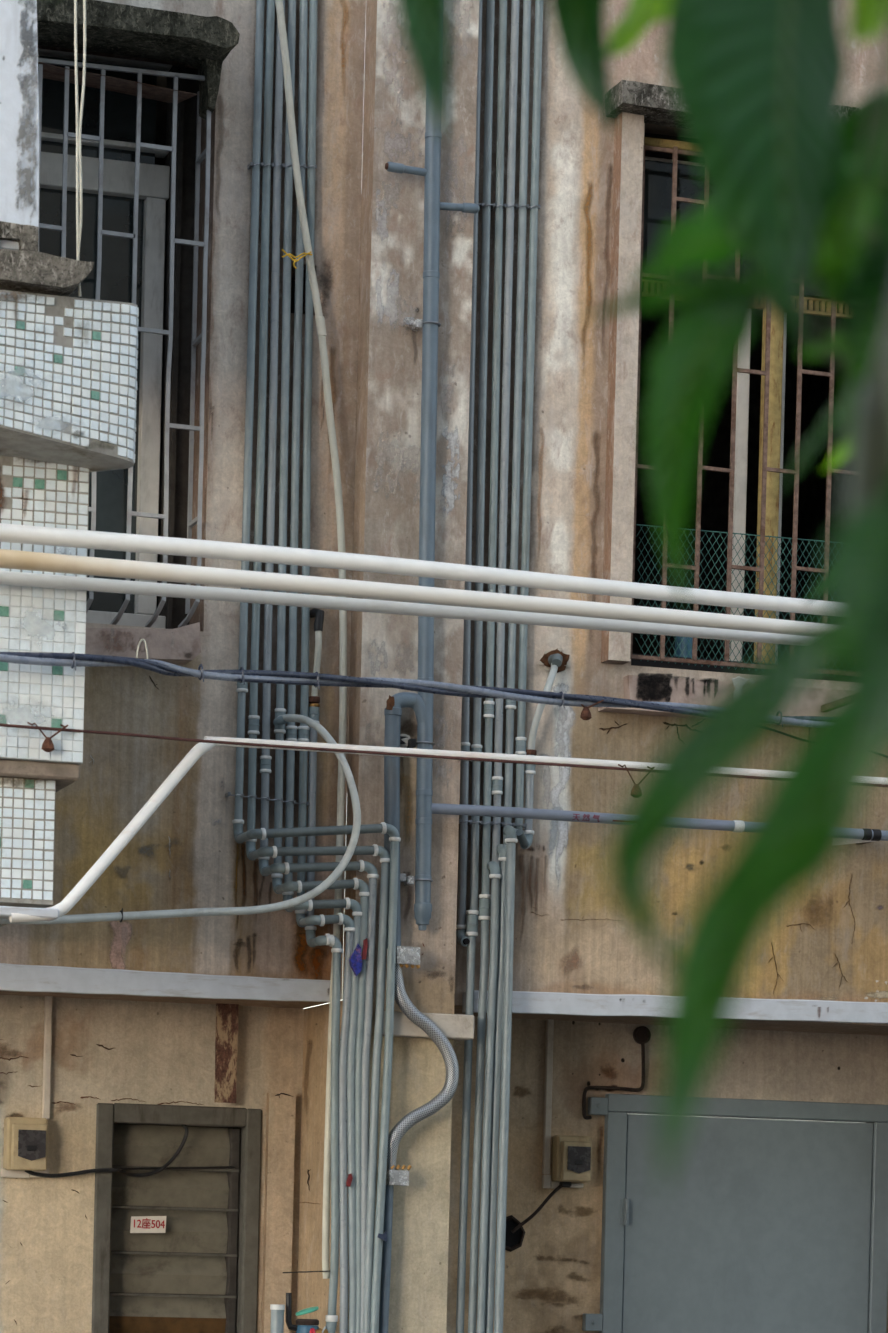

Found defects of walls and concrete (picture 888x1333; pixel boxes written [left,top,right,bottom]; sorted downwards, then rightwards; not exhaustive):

peeling [442,428,460,512]
crack [768,923,814,995]
crack [833,877,855,987]